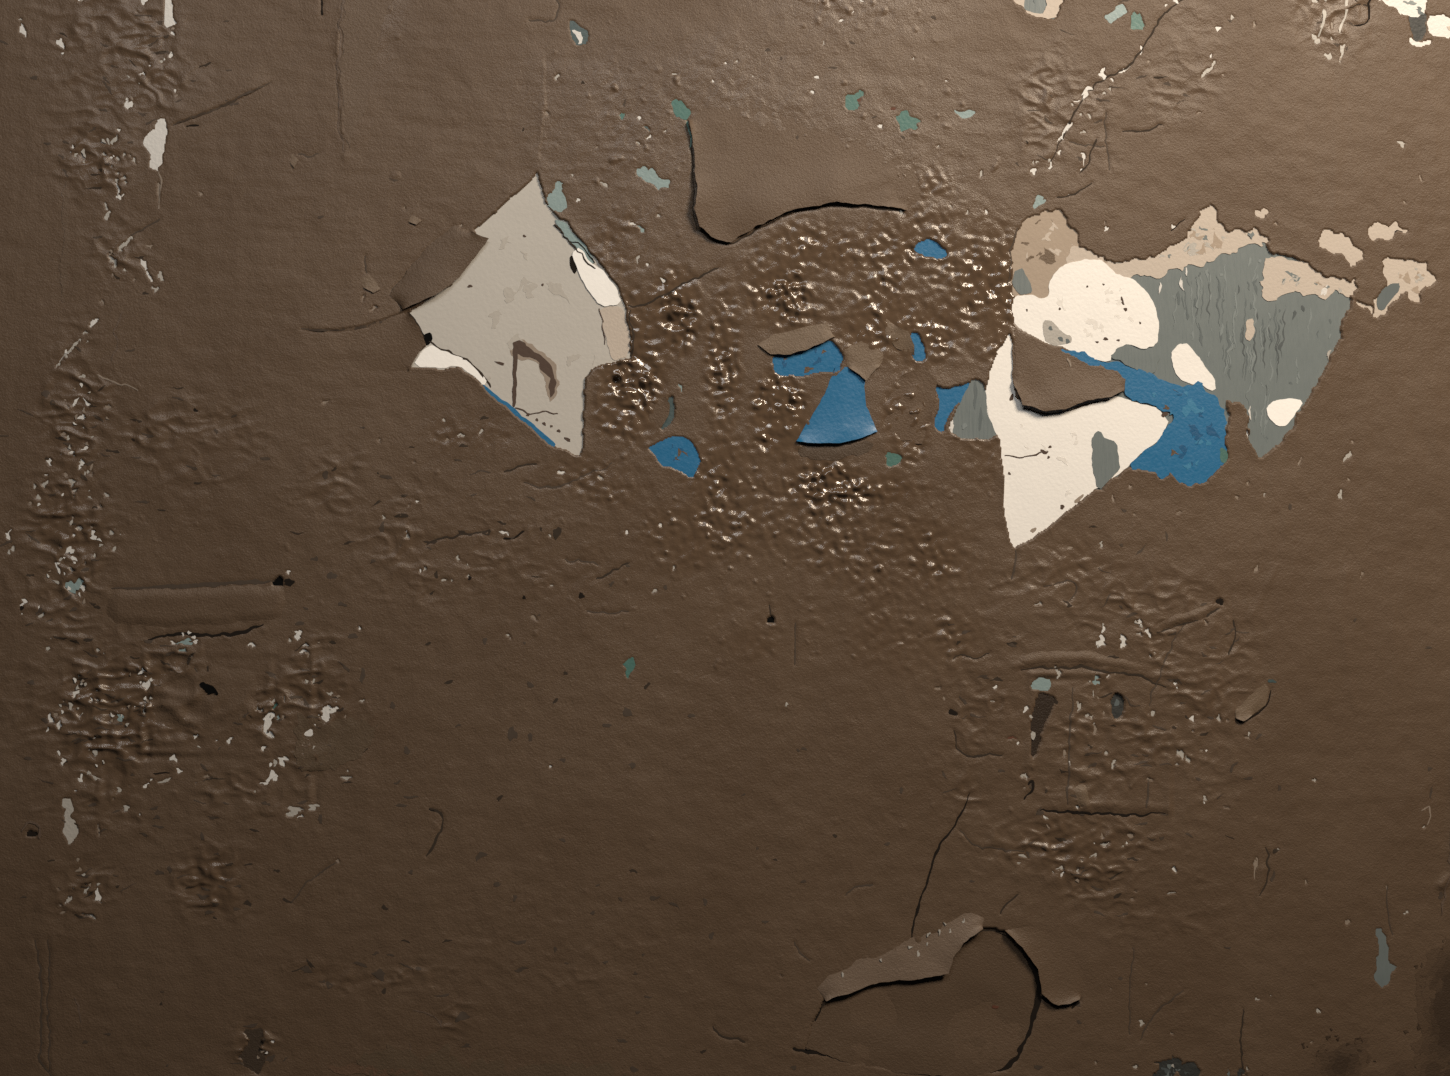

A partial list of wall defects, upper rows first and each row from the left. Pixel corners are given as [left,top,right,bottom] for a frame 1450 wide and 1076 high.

peeling [1014,0,1073,35]
peeling [1105,4,1144,30]
crack [628,120,904,359]
peeling [360,174,631,455]
peeling [649,396,701,477]
peeling [758,319,926,443]
peeling [935,195,1436,547]
spalling [26,618,198,756]
crack [949,709,1002,758]
crack [1021,608,1236,817]
crack [911,793,1024,937]
peeling [1374,928,1396,987]